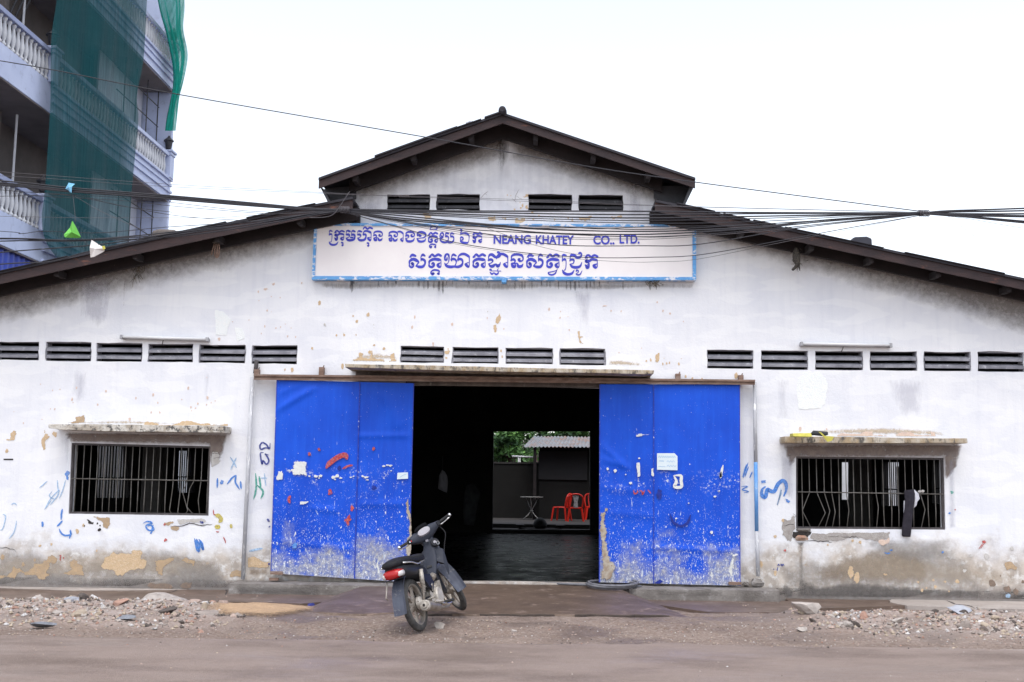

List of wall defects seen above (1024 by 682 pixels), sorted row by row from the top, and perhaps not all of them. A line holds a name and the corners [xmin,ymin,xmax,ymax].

peeling [341,344,396,369]
peeling [76,516,110,534]
peeling [773,516,890,546]
peeling [0,543,84,580]
peeling [96,550,195,589]
water stain [785,548,961,596]